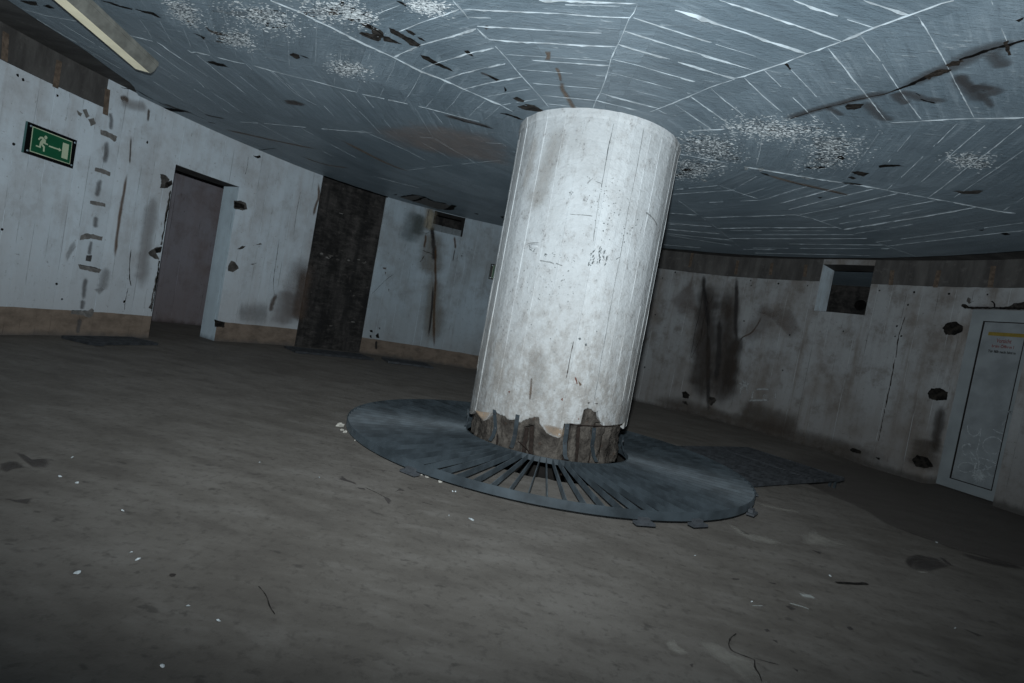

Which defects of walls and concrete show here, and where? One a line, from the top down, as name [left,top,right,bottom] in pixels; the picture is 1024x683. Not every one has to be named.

crack [790,40,1024,120]
damp [667,278,858,454]
crack [878,317,905,441]
spalling [928,388,948,401]
spalling [942,322,963,335]
spalling [471,402,623,482]
spalling [912,455,933,468]